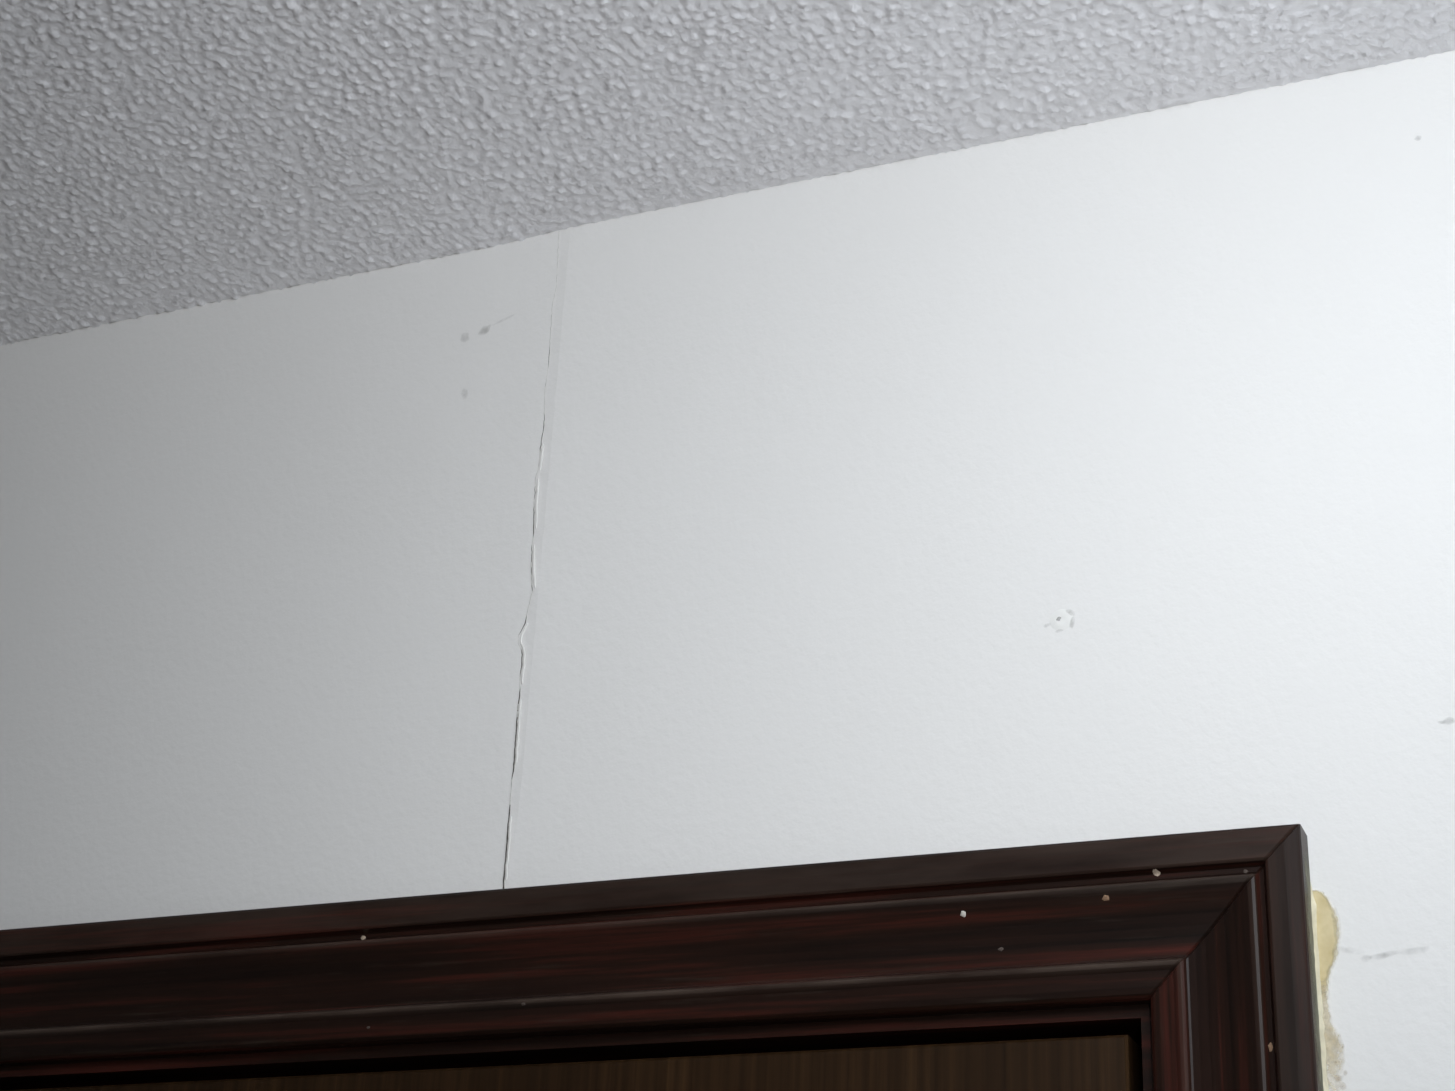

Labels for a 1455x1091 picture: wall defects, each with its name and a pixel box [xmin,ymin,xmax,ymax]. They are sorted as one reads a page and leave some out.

crack [503,238,559,889]